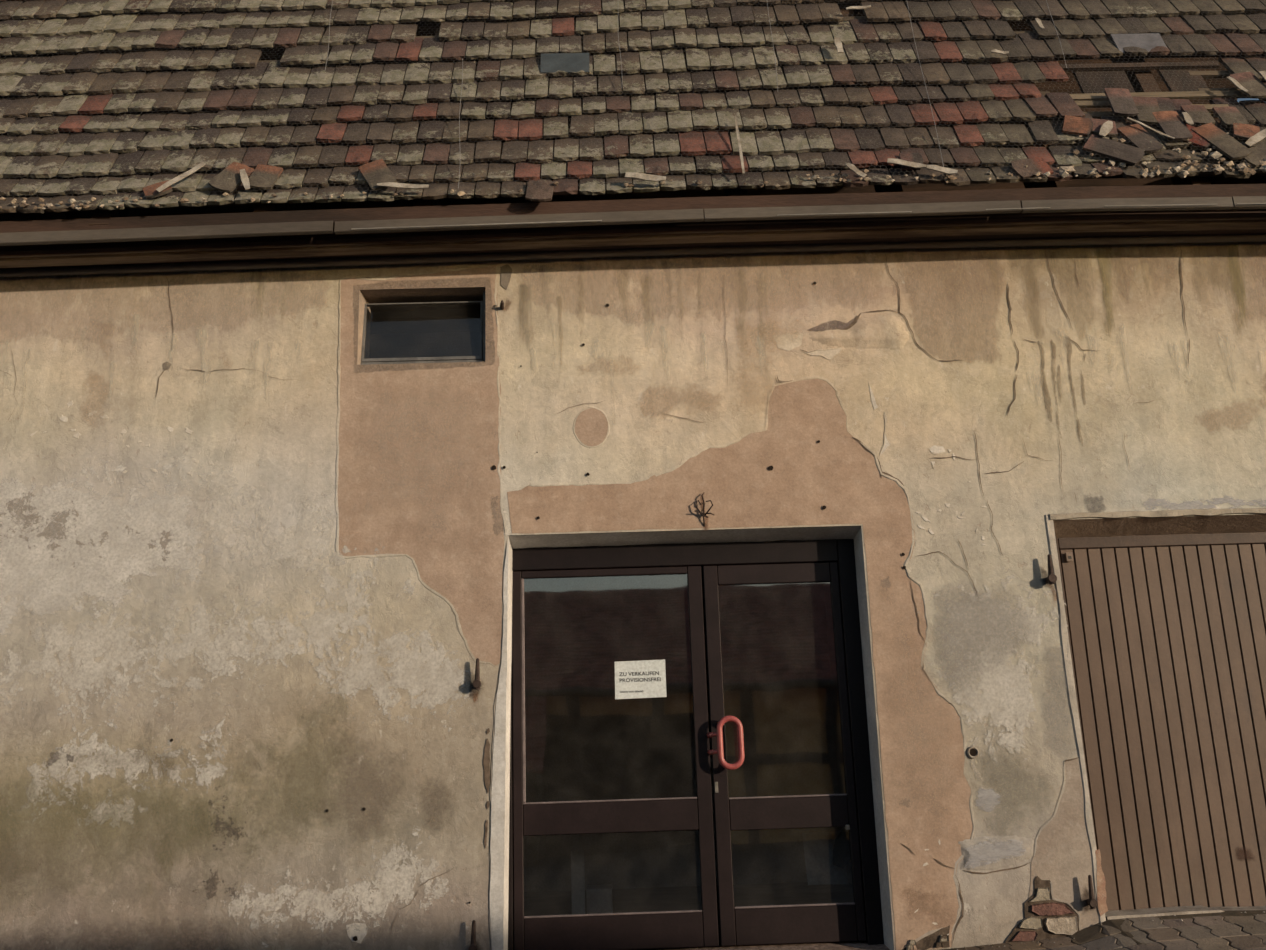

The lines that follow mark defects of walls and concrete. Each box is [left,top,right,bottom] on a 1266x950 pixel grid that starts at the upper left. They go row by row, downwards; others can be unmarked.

crack [863,254,956,362]
crack [1045,250,1101,360]
crack [1180,247,1190,363]
crack [852,437,904,486]
crack [934,283,1077,555]
damp [1040,340,1084,407]
peeling [0,265,1068,950]
crack [910,540,978,704]
peeling [1005,757,1108,943]